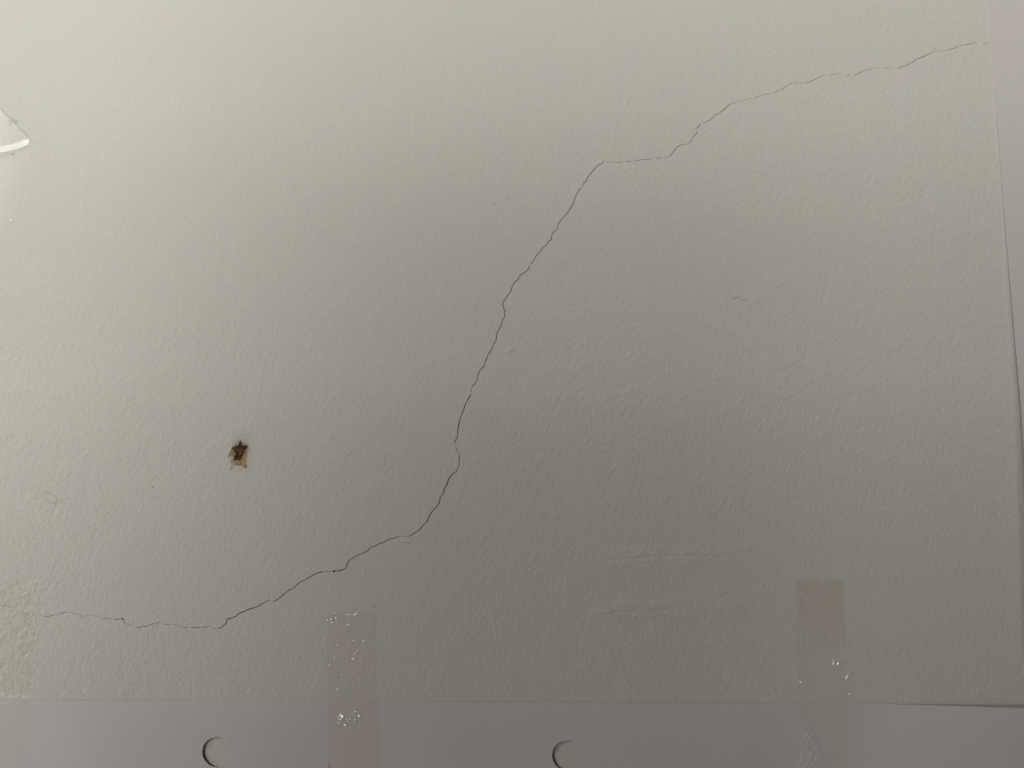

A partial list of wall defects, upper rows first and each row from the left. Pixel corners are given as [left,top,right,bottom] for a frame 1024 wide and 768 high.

crack [8,42,986,629]